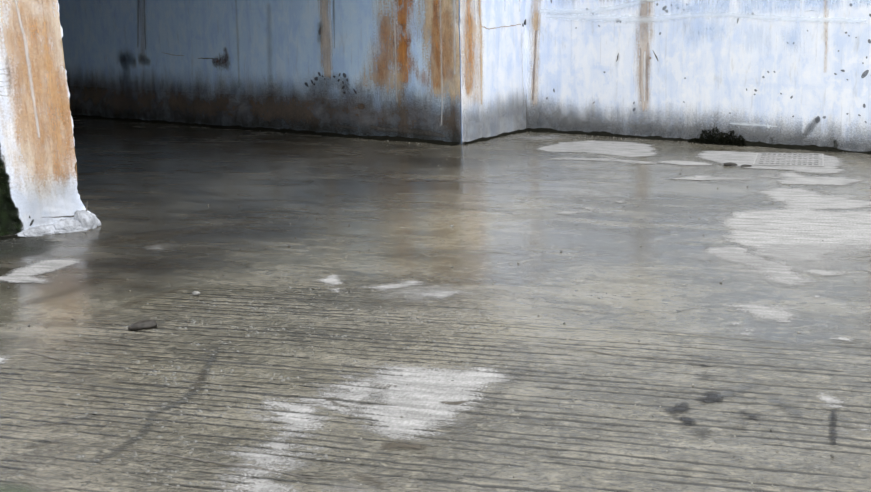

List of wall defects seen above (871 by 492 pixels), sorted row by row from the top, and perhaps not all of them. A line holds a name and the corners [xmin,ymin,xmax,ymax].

rust [1,0,72,186]
rust [362,0,477,100]
leakage [67,0,871,152]
crack [479,0,521,99]
spalling [0,146,34,237]